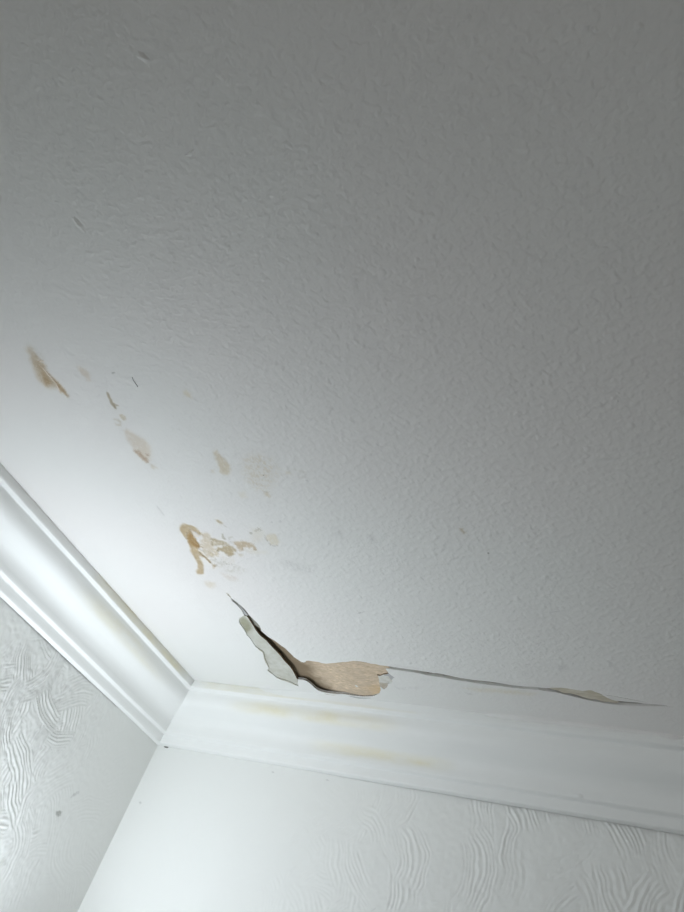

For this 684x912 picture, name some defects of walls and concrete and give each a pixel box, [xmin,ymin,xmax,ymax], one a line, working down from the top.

peeling [239,615,394,697]
crack [388,666,673,708]